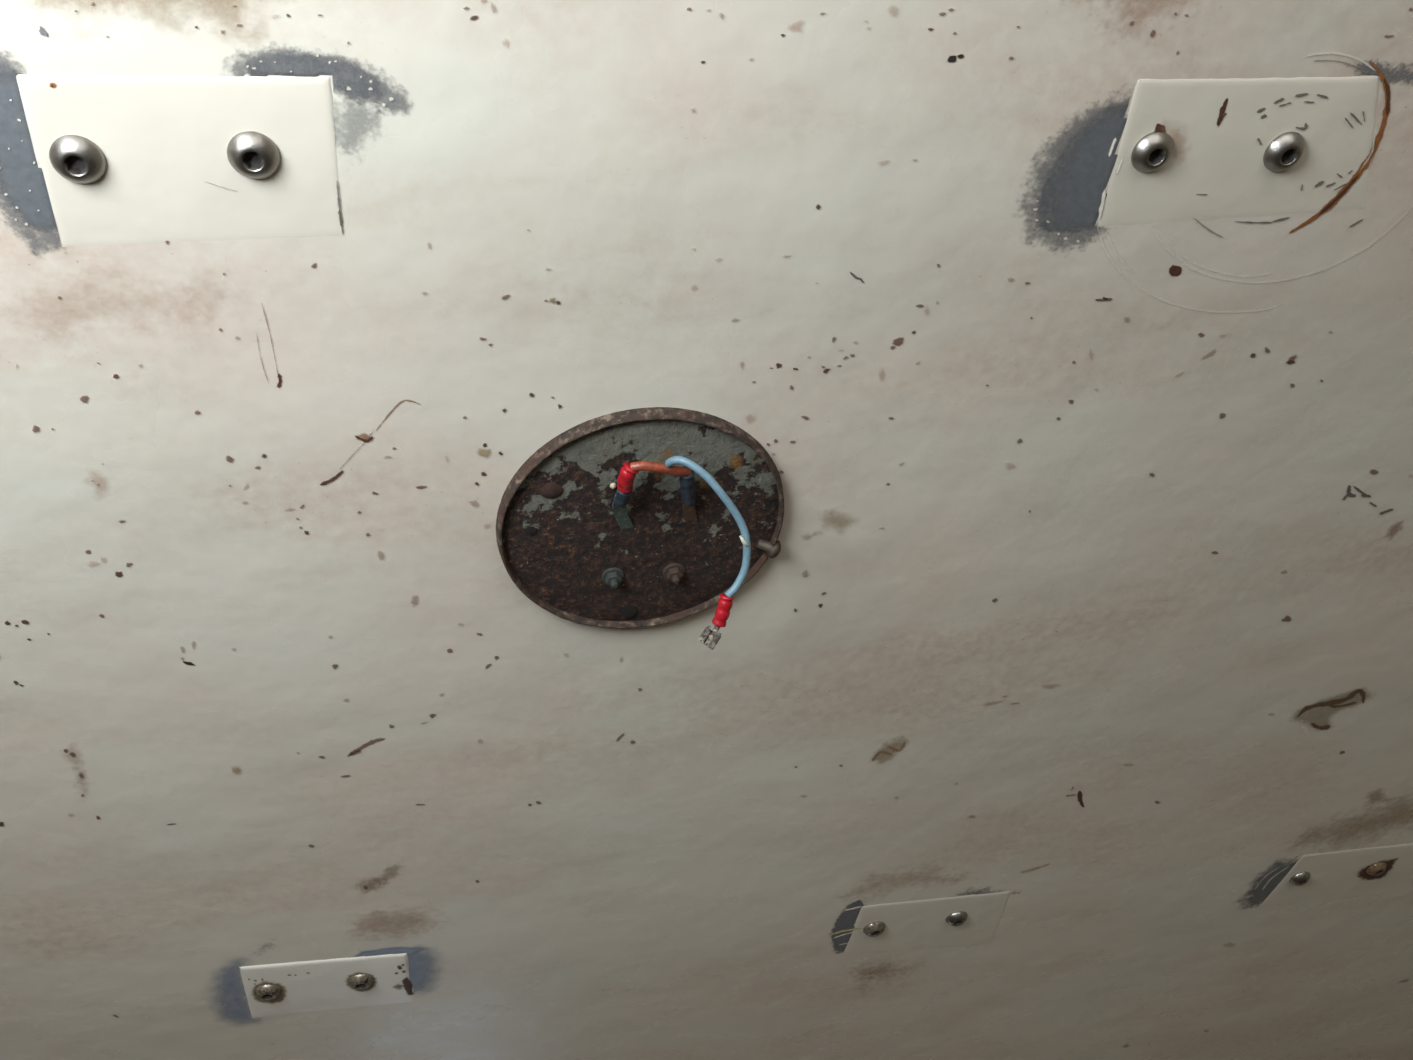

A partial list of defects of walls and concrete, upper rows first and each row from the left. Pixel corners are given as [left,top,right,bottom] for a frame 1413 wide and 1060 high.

peeling [0,55,62,255]
peeling [232,49,409,113]
peeling [1022,98,1130,250]
rust [475,443,503,486]